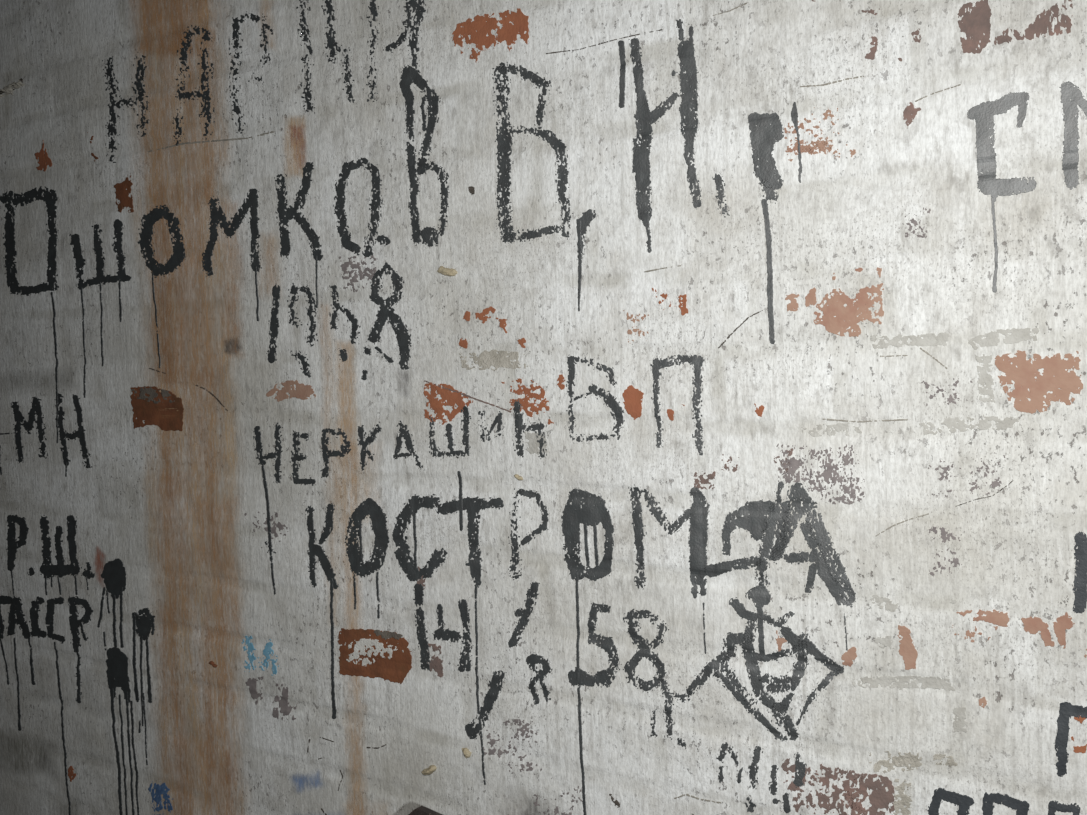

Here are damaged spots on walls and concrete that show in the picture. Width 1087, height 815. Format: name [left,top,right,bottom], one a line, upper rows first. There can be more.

peeling [452,8,529,62]
peeling [957,0,1073,54]
peeling [463,306,507,333]
peeling [785,267,949,349]
peeling [130,386,184,431]
peeling [423,382,473,425]
peeling [459,338,554,454]
peeling [919,328,1083,435]
peeling [927,452,1010,497]
peeling [338,628,412,684]
peeling [462,719,542,777]
peeling [781,751,957,815]